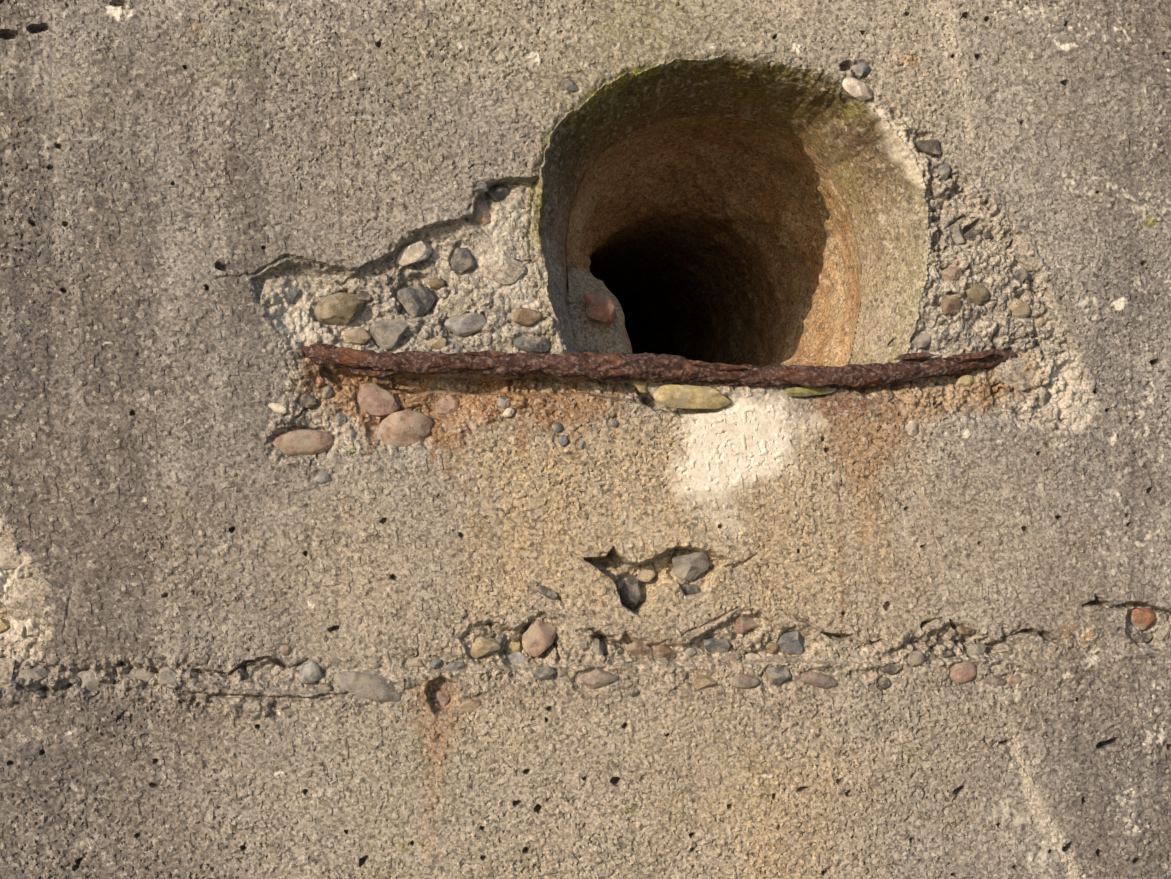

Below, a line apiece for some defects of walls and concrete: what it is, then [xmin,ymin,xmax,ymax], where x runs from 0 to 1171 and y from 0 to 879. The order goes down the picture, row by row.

crack [216,254,376,280]
spalling [836,60,1111,438]
spalling [250,175,560,469]
damp [695,382,747,396]
corrosion [296,343,1051,630]
damp [444,385,930,660]
crack [61,592,74,636]
crack [537,585,569,605]
crack [0,607,1171,707]
spalling [586,545,735,617]
spalling [587,610,822,665]
crack [1082,593,1171,616]